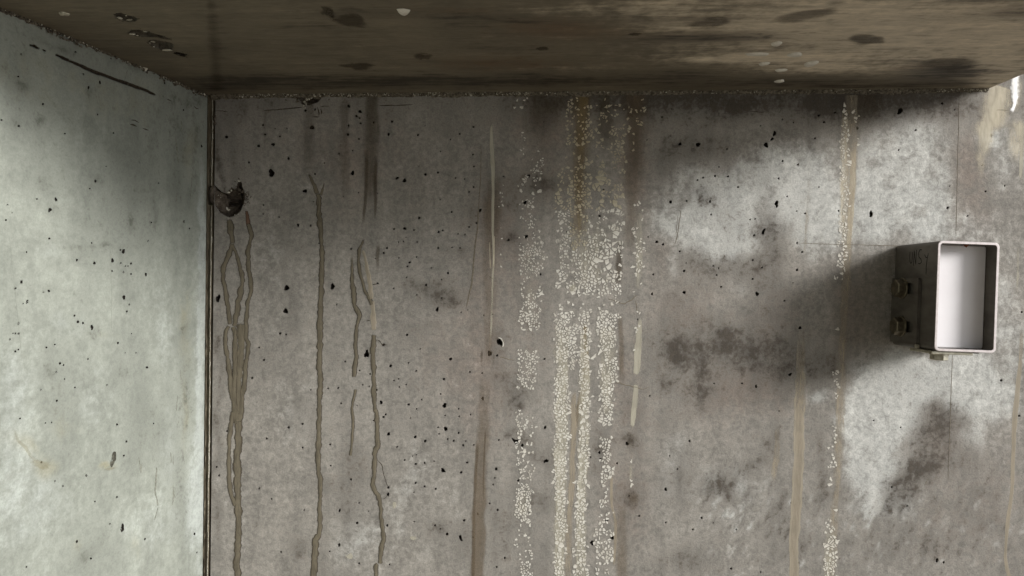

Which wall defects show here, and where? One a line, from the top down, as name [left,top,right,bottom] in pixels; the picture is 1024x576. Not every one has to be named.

spalling [208,178,252,218]
leakage [834,98,860,313]
leakage [513,410,537,576]
leakage [516,96,646,576]
leakage [789,369,805,576]
leakage [823,509,840,576]
leakage [827,327,845,496]